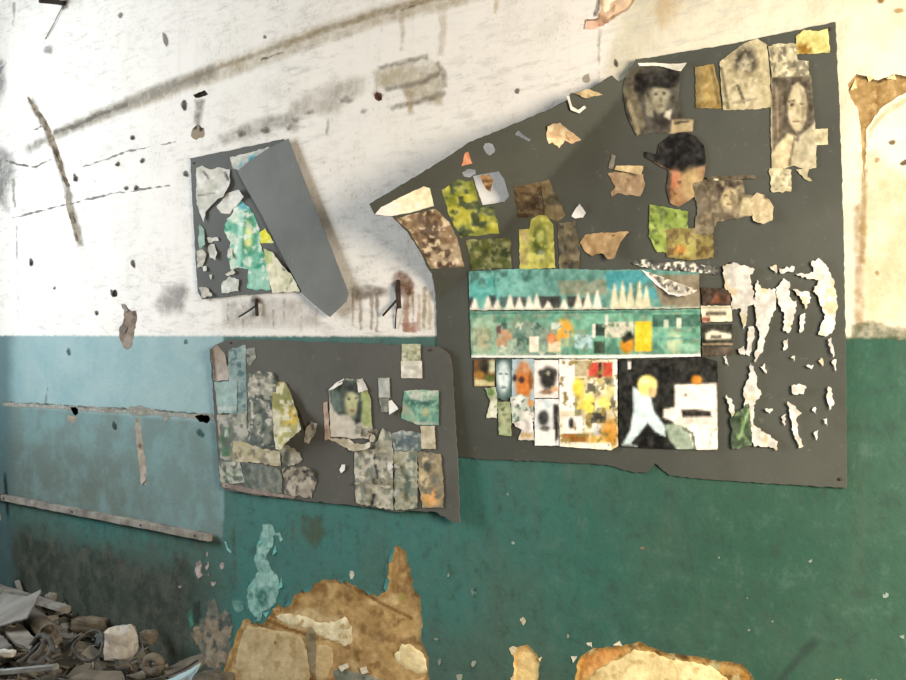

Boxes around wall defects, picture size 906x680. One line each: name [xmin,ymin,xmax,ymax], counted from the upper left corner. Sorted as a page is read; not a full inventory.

flaking render [584,0,634,46]
water stain [28,67,214,150]
water stain [381,58,438,109]
flaking render [847,74,906,262]
flaking render [110,289,137,350]
flaking render [188,524,441,680]
flaking render [509,645,542,680]
flaking render [571,641,754,680]